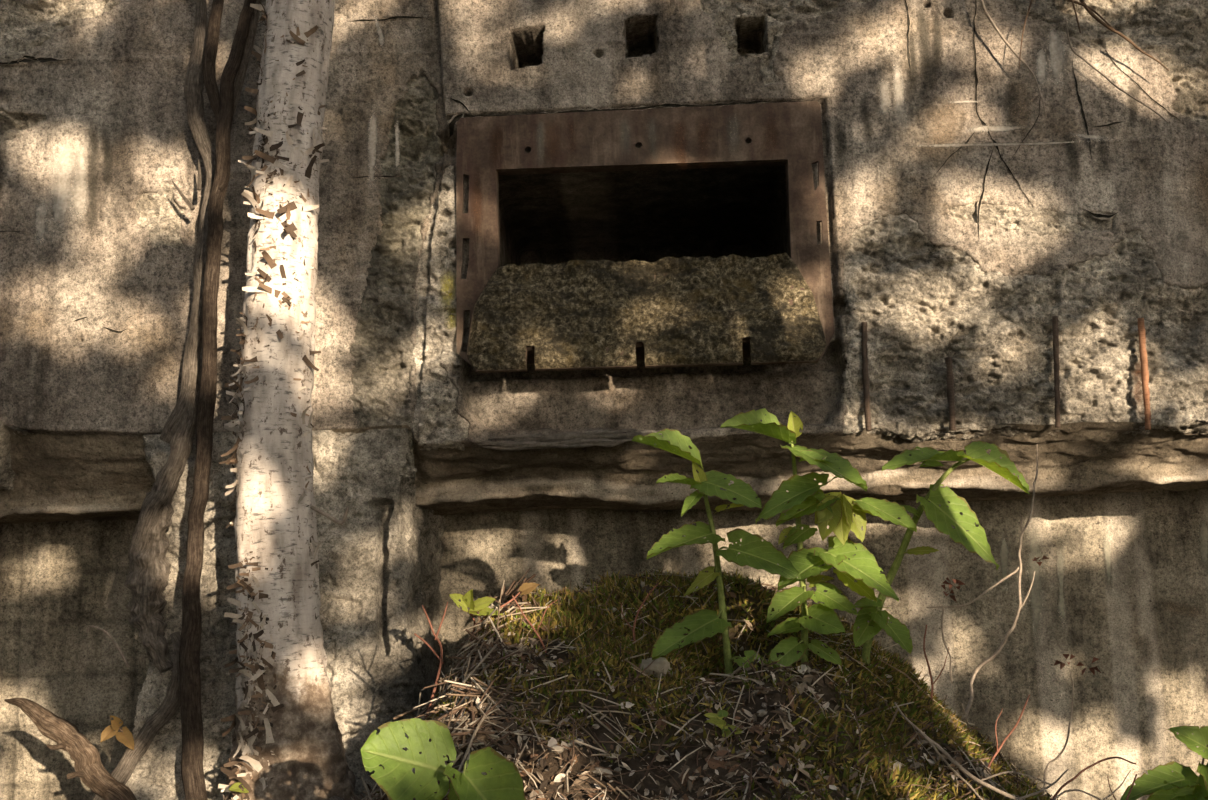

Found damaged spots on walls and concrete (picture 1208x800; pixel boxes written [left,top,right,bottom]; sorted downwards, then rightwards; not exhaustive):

spalling [0,0,120,67]
spalling [0,110,47,144]
spalling [840,203,1208,442]
spalling [0,421,34,490]